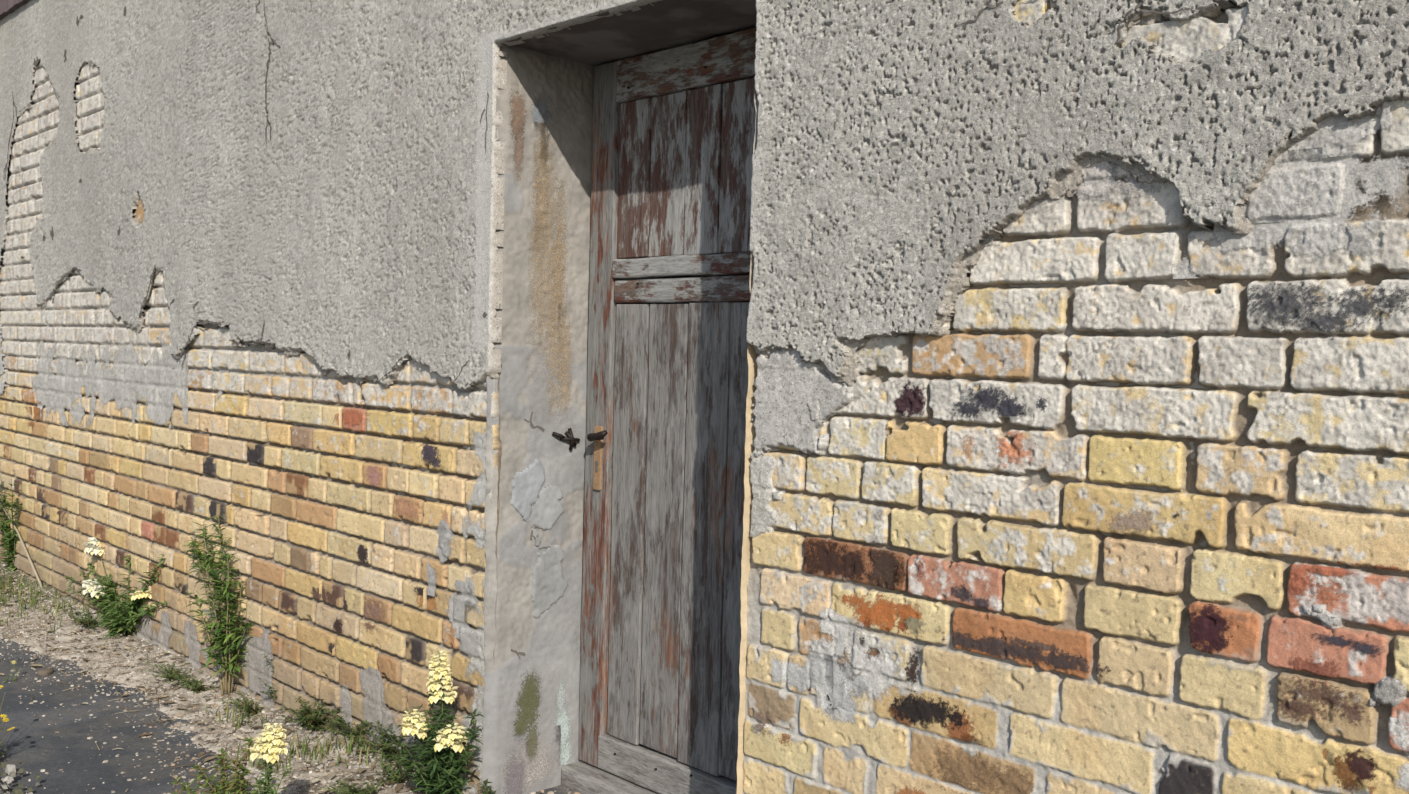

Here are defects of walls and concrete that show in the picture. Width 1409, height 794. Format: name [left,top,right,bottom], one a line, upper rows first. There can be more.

flaking render [34,56,107,154]
crack [255,0,281,143]
peeling [21,141,188,429]
flaking render [197,318,495,396]
peeling [749,92,1409,538]
peeling [510,458,564,537]
peeling [359,666,384,712]
peeling [427,428,494,794]
damp [499,675,573,794]
peeling [811,607,870,713]